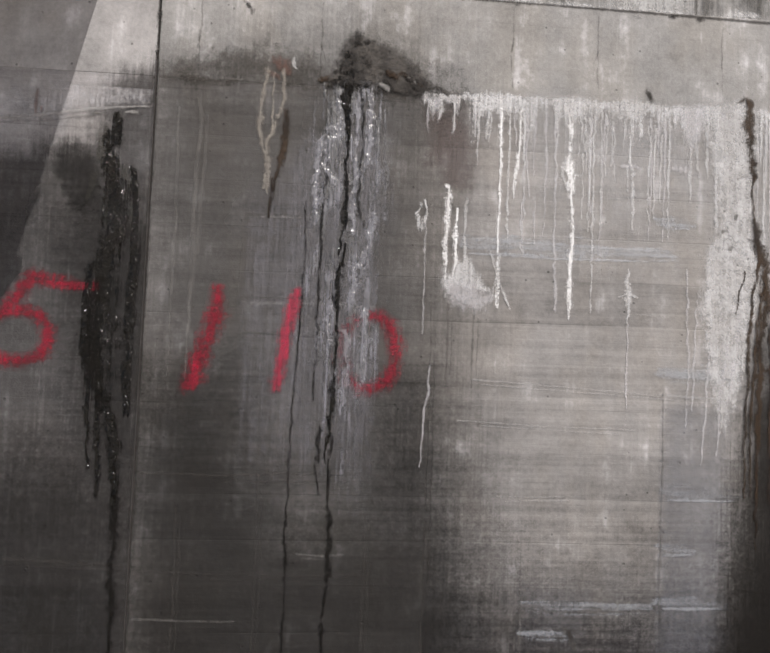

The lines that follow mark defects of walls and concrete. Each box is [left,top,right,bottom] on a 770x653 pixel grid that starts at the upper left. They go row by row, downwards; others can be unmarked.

leakage [0,0,161,653]
leakage [292,70,389,653]
leakage [451,208,467,281]
leakage [477,98,526,308]
leakage [555,99,615,319]
leakage [625,119,671,222]
leakage [751,177,770,245]